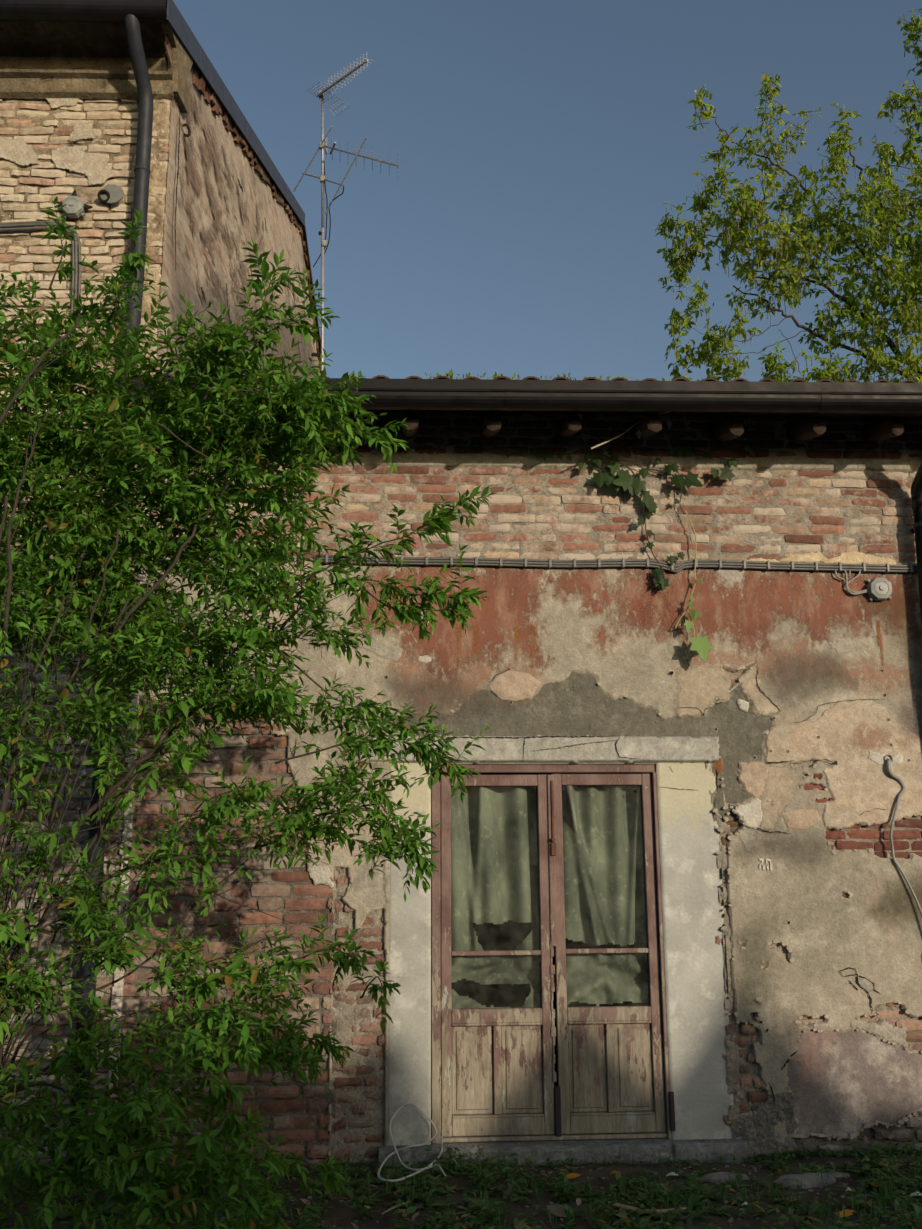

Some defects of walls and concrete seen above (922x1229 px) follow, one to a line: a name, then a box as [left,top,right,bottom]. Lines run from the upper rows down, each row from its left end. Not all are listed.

peeling [308,854,386,913]
peeling [354,550,922,1159]
crack [839,967,879,1015]